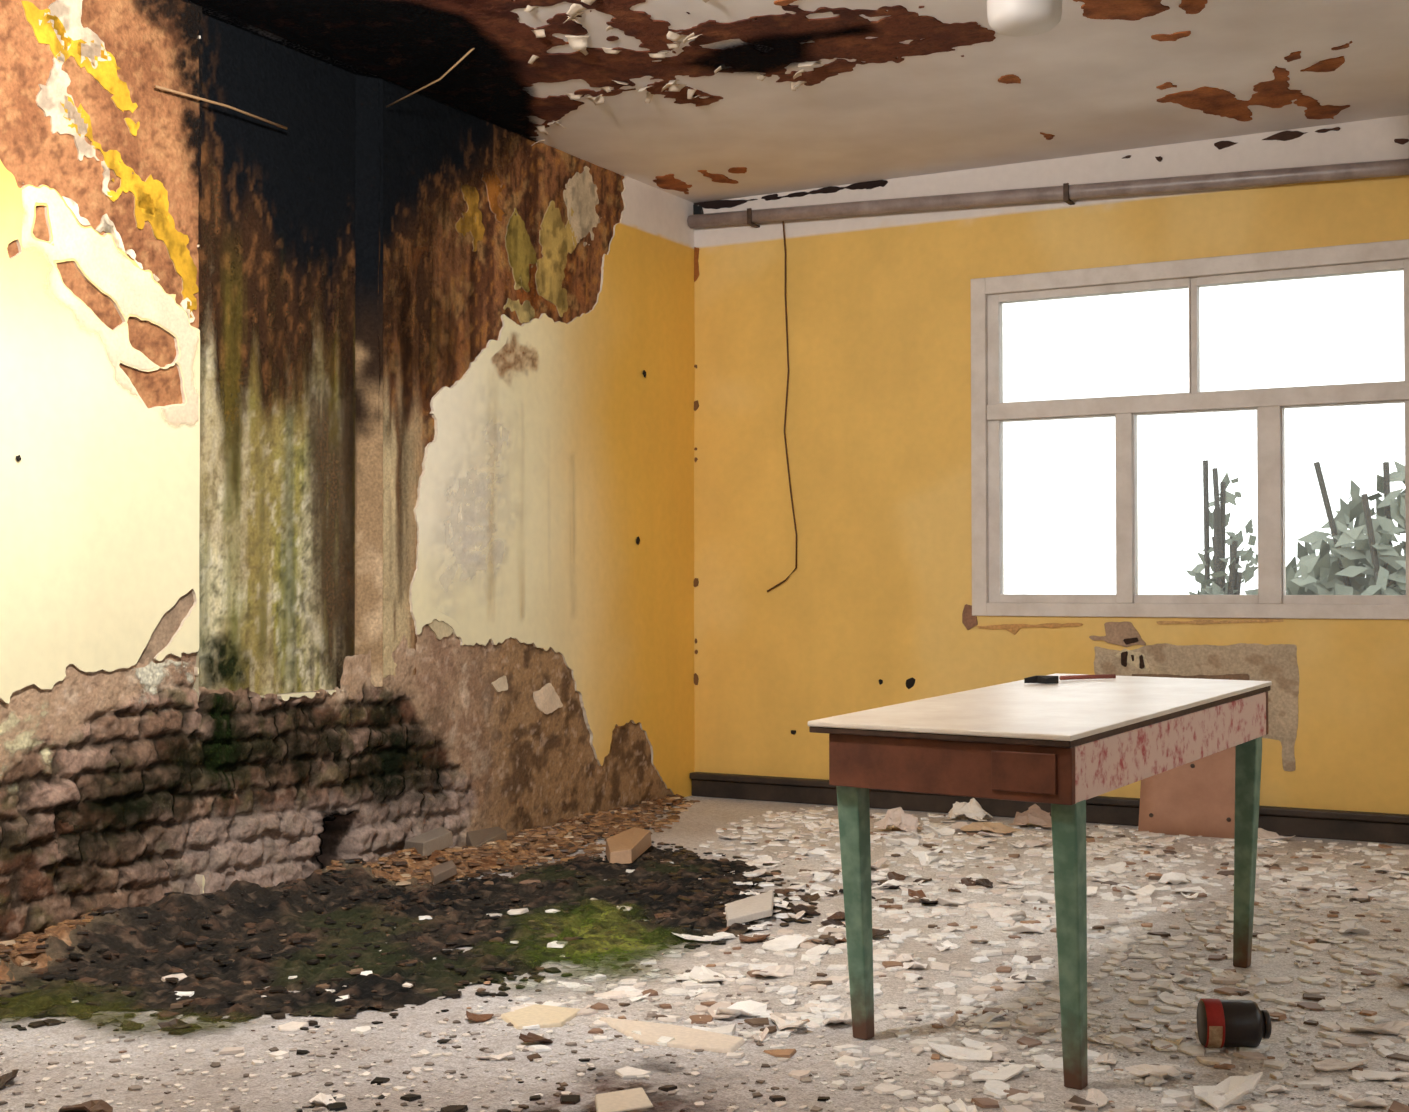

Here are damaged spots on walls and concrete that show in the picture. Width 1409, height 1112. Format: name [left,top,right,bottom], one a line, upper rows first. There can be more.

peeling [1073,0,1208,21]
peeling [1151,31,1191,41]
peeling [998,74,1021,84]
peeling [1156,41,1352,122]
water stain [134,0,526,689]
water stain [494,336,536,375]
flaking render [0,0,996,942]
water stain [0,712,50,760]
water stain [54,660,441,871]